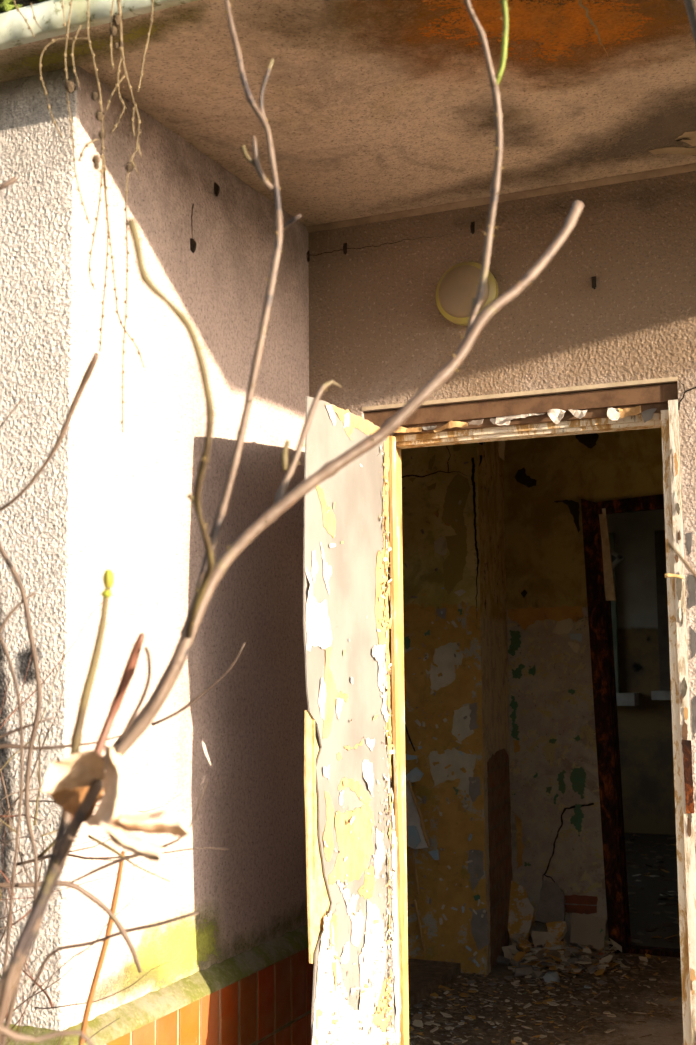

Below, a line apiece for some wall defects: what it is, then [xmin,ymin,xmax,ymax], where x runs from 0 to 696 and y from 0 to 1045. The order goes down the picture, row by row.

corrosion [402,0,669,67]
peeling [325,404,352,440]
peeling [394,409,587,433]
spalling [575,433,599,448]
peeling [607,406,656,423]
crack [678,380,696,410]
crack [402,442,484,609]
peeling [305,536,344,652]
peeling [312,446,531,1045]
peeling [546,767,586,837]
crack [542,803,594,893]
spalling [565,895,598,914]